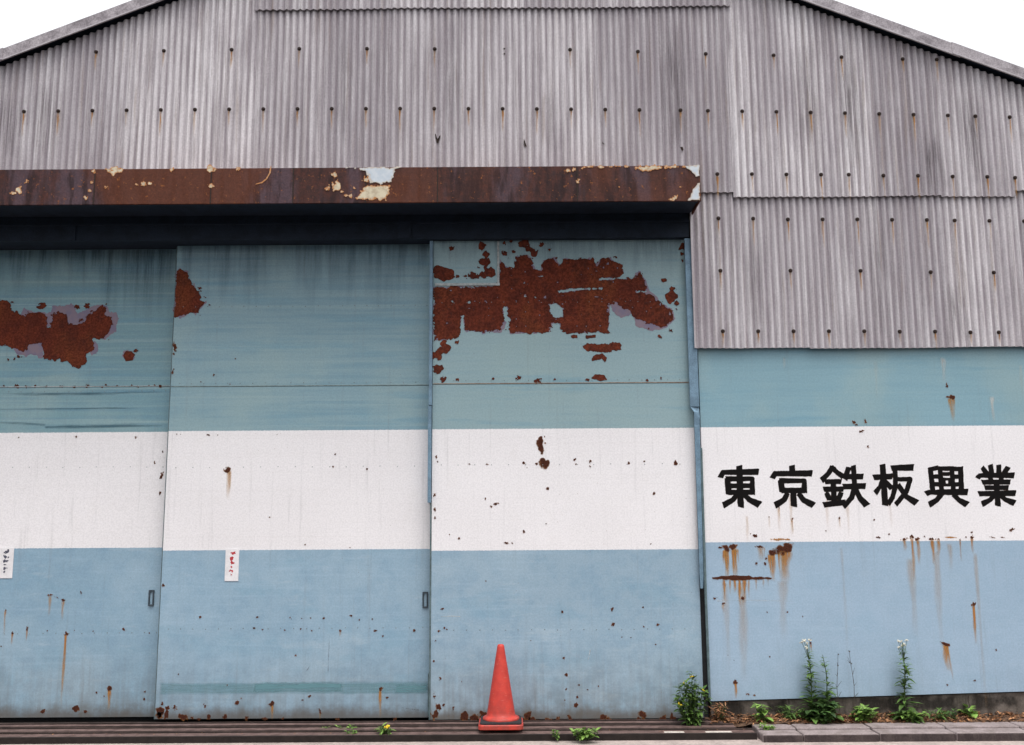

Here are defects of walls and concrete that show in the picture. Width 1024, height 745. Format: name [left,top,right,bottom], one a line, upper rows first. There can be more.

peeling [324,166,400,201]
corrosion [522,436,550,469]
corrosion [876,532,974,562]
corrosion [712,533,792,604]
corrosion [155,702,227,721]